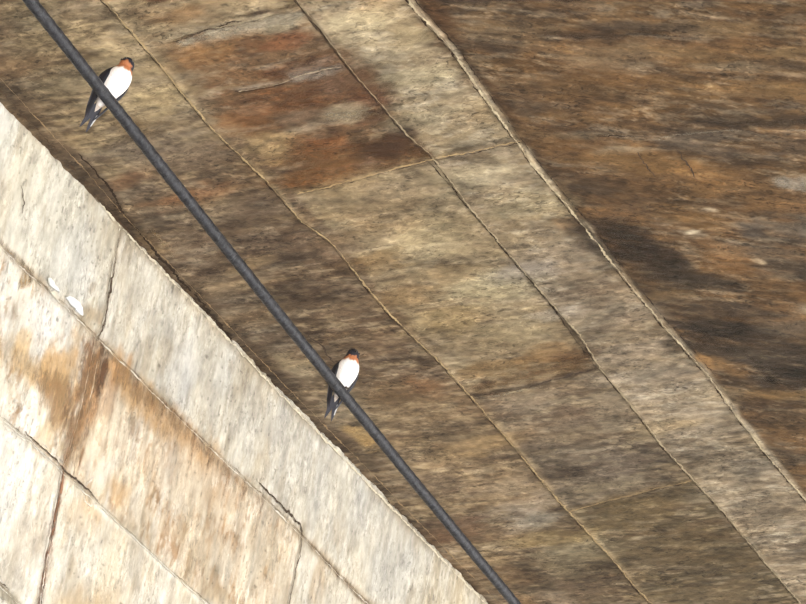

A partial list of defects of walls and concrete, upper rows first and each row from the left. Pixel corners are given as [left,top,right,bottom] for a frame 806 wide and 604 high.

peeling [48,278,83,315]
crack [25,431,98,501]